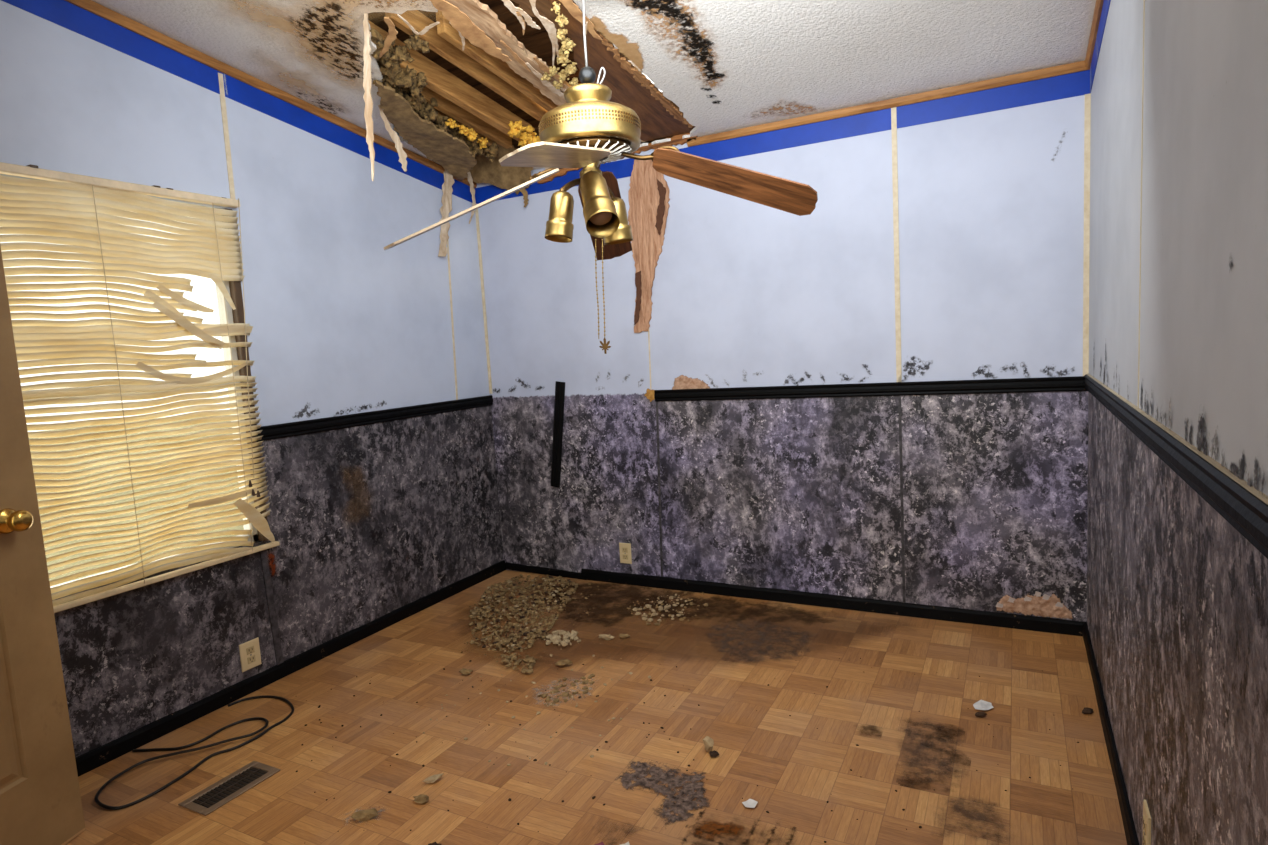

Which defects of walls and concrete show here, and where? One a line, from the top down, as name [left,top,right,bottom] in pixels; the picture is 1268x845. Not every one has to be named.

damp [253,0,426,80]
damp [627,0,725,104]
peeling [672,375,709,390]
damp [550,583,824,661]
peeling [996,591,1073,619]
damp [904,724,961,787]
damp [684,812,774,845]